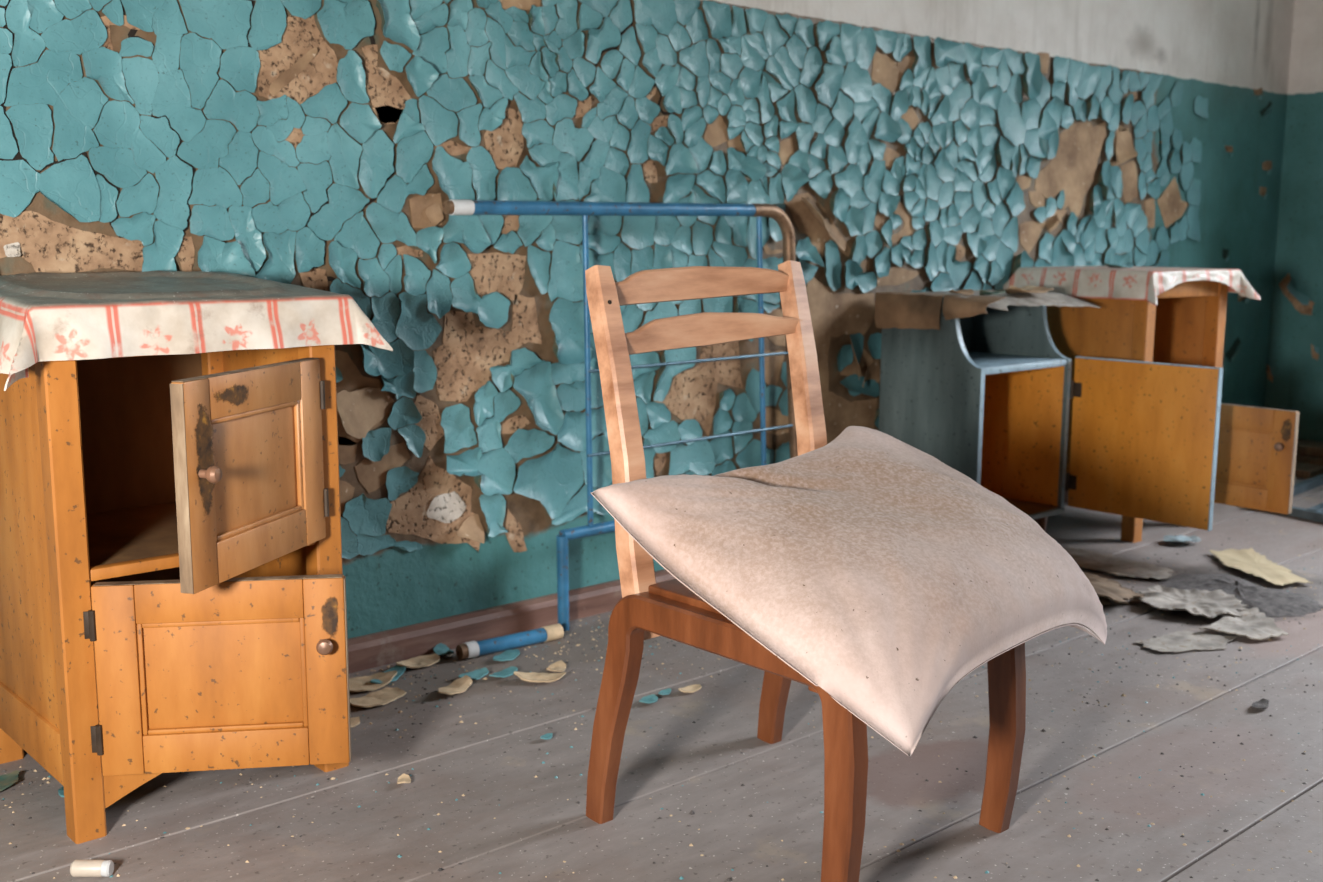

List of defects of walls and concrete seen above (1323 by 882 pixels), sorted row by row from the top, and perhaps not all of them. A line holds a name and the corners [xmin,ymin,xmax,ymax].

peeling [41,0,165,104]
peeling [1022,52,1069,108]
peeling [0,154,371,319]
crack [0,0,880,525]
peeling [218,0,971,559]
peeling [1000,71,1201,275]
peeling [195,385,248,514]